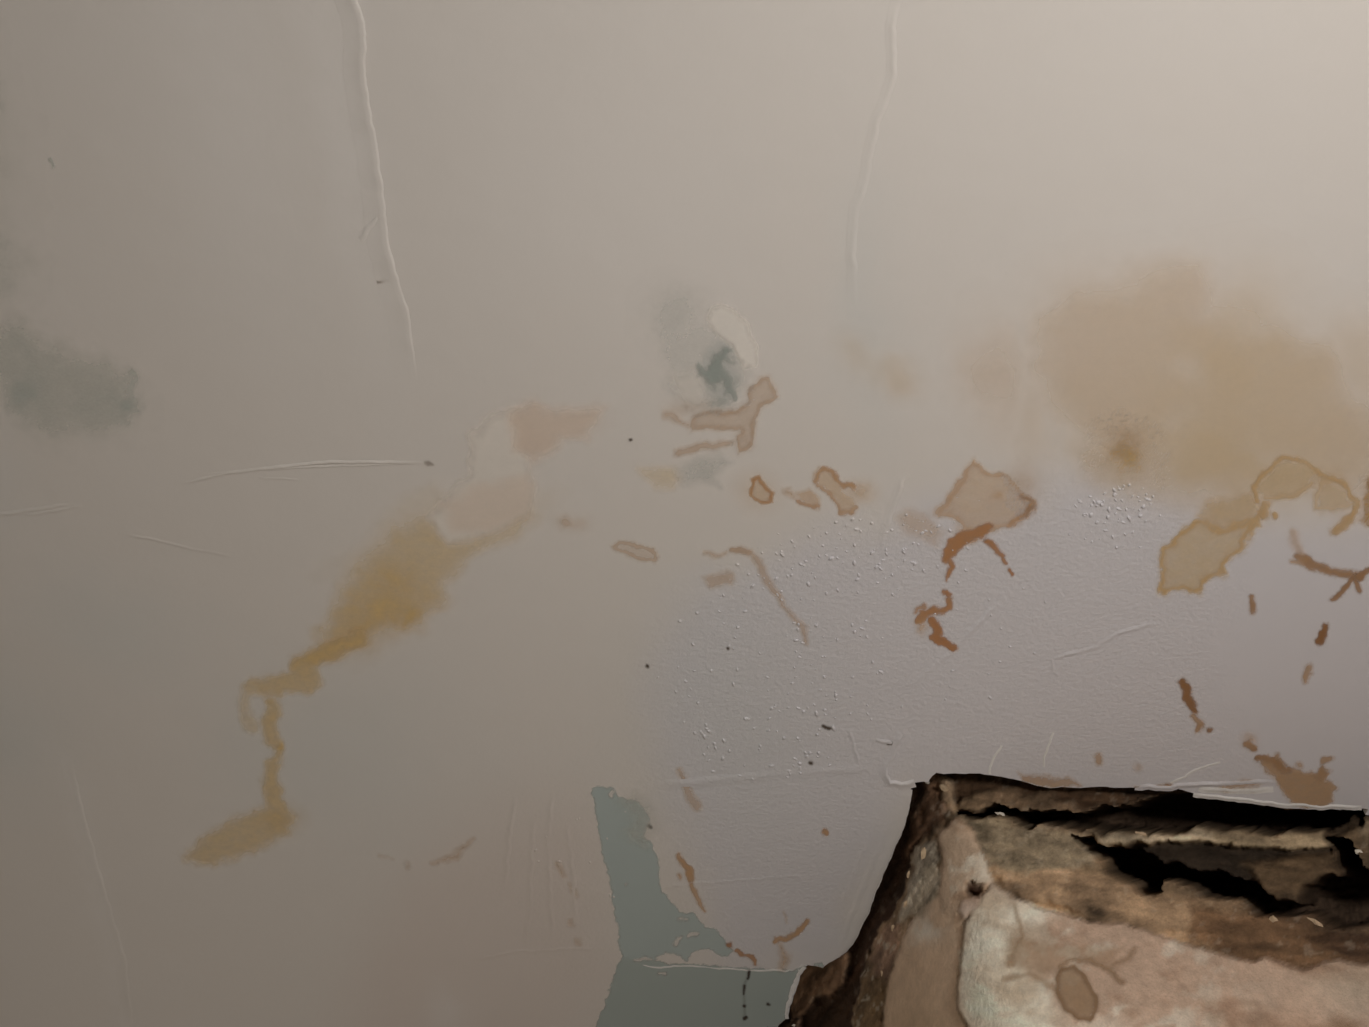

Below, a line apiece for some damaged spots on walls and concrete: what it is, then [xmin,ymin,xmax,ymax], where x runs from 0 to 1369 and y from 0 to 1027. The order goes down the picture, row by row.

damp [678,378,777,454]
damp [749,475,774,504]
damp [797,466,857,515]
damp [1052,277,1369,595]
damp [189,406,595,864]
spalling [591,773,1369,1027]